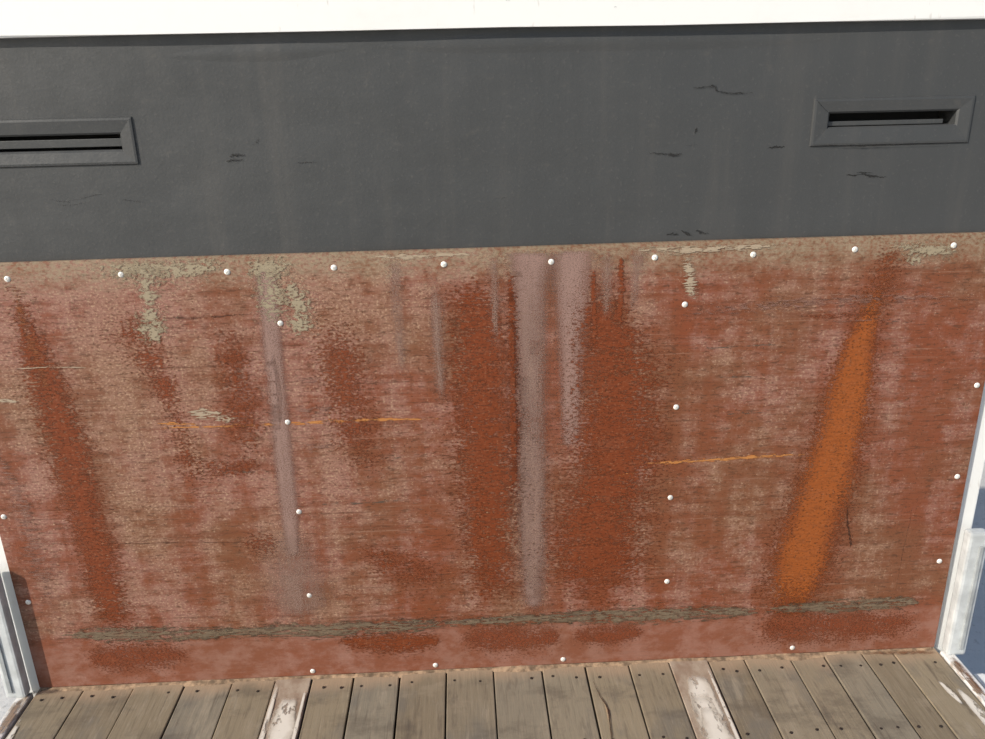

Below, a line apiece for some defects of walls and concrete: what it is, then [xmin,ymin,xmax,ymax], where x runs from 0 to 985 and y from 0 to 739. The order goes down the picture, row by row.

rust [2,287,188,675]
water stain [484,249,650,613]
rust [358,247,925,659]